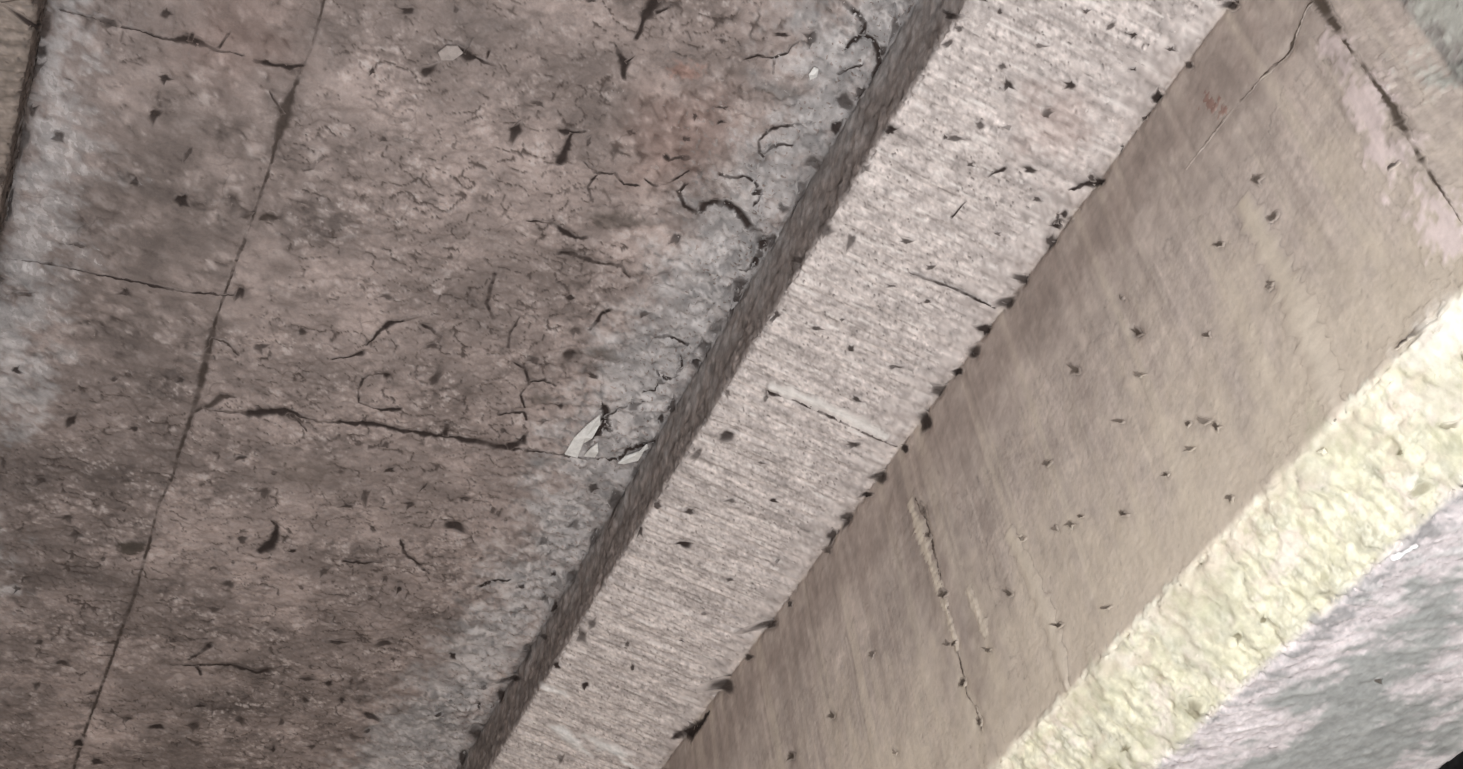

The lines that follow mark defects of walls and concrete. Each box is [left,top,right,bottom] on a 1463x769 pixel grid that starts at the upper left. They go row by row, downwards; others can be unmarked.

crack [743,40,799,75]
crack [835,0,883,81]
crack [1185,0,1463,224]
crack [526,120,815,332]
crack [5,0,690,769]
peeling [565,415,600,458]
crack [914,498,950,614]
crack [958,650,983,731]